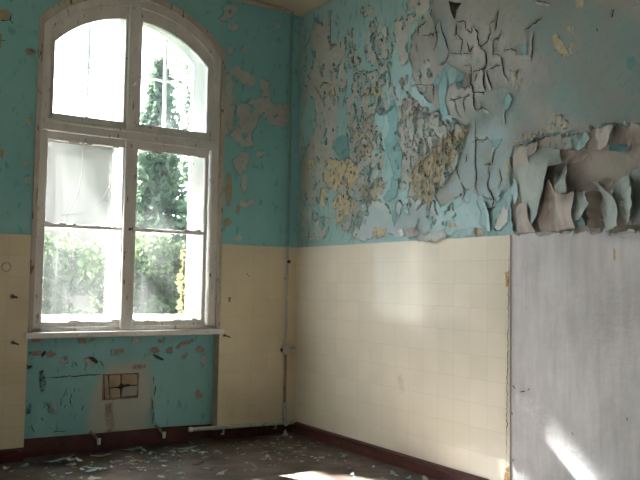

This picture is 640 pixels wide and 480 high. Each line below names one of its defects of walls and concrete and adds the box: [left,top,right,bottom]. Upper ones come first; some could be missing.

peeling [223,77,289,228]
peeling [300,0,640,243]
crack [410,1,550,212]
crack [47,358,104,411]
flaking render [150,338,207,368]